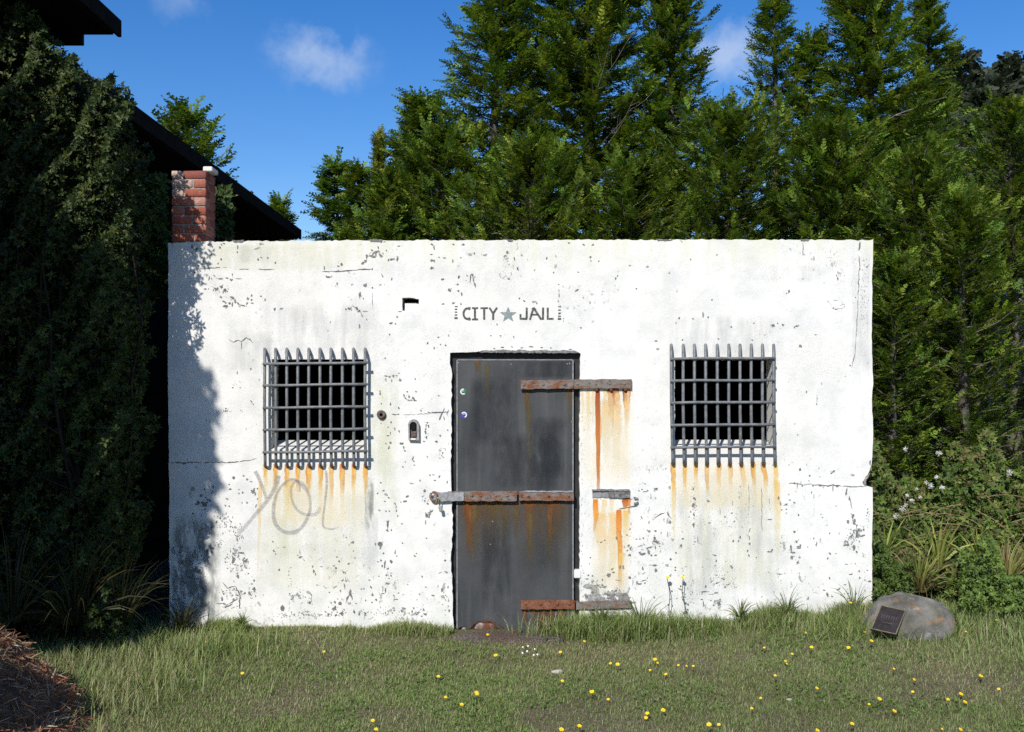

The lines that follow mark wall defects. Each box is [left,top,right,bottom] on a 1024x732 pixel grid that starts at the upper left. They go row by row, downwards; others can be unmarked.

crack [173,457,256,465]
peeling [171,475,258,609]
rust [259,464,368,504]
rust [464,500,566,542]
rust [588,388,631,479]
rust [593,498,636,575]
rust [670,461,780,503]
peeling [732,508,871,600]
crack [793,482,865,537]